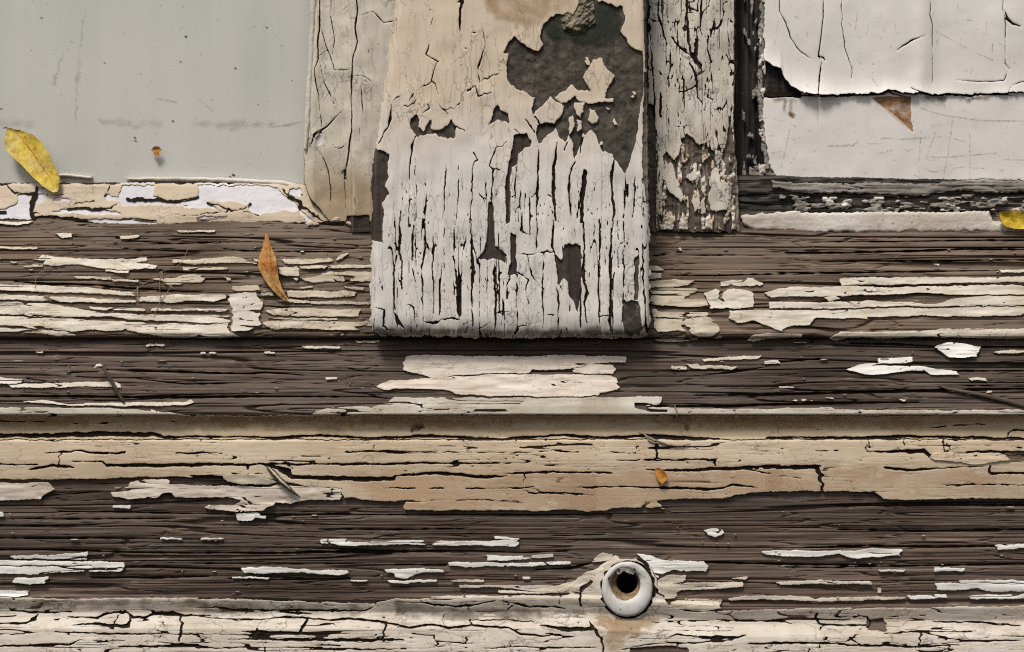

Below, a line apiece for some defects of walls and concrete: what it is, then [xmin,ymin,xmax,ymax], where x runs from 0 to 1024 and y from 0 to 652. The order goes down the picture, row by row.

peeling [476,0,741,277]
crack [282,0,1024,339]
peeling [0,182,315,239]
peeling [0,246,380,349]
peeling [554,243,584,312]
peeling [621,252,1024,358]
peeling [0,377,194,412]
peeling [377,355,626,397]
peeling [111,473,342,521]
crack [0,340,1024,652]
peeling [232,566,368,582]
peeling [320,536,1024,612]